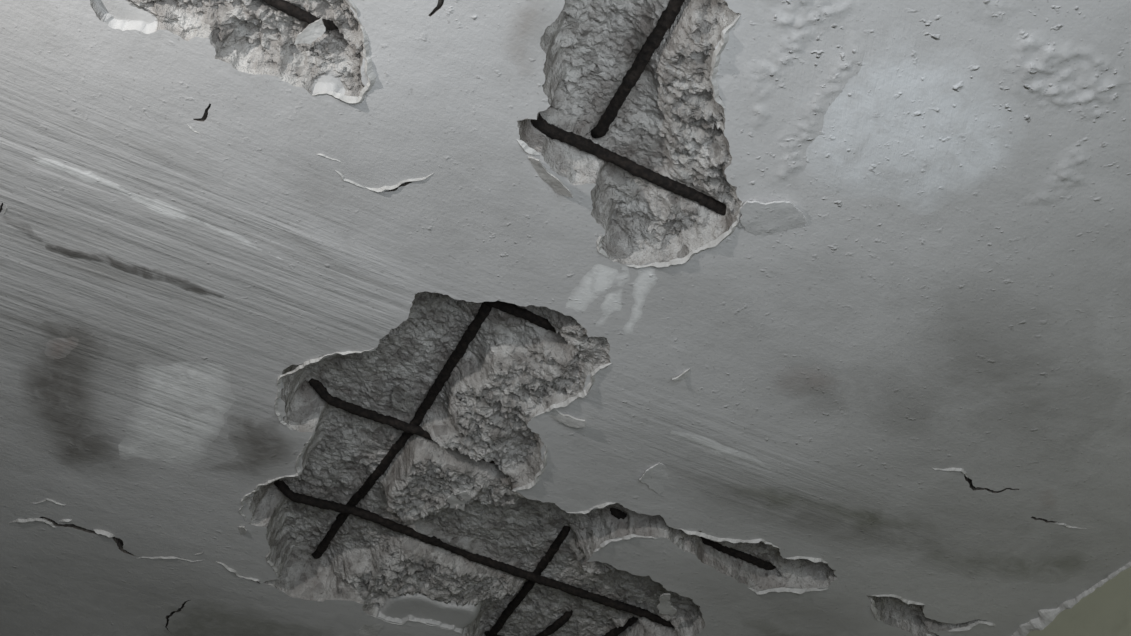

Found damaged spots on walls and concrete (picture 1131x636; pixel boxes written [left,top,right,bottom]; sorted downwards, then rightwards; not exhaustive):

crack [429,0,444,16]
spalling [90,0,376,104]
spalling [517,0,806,268]
spalling [238,291,838,636]
crack [933,468,1019,493]
crack [8,498,260,584]
spalling [866,594,997,636]